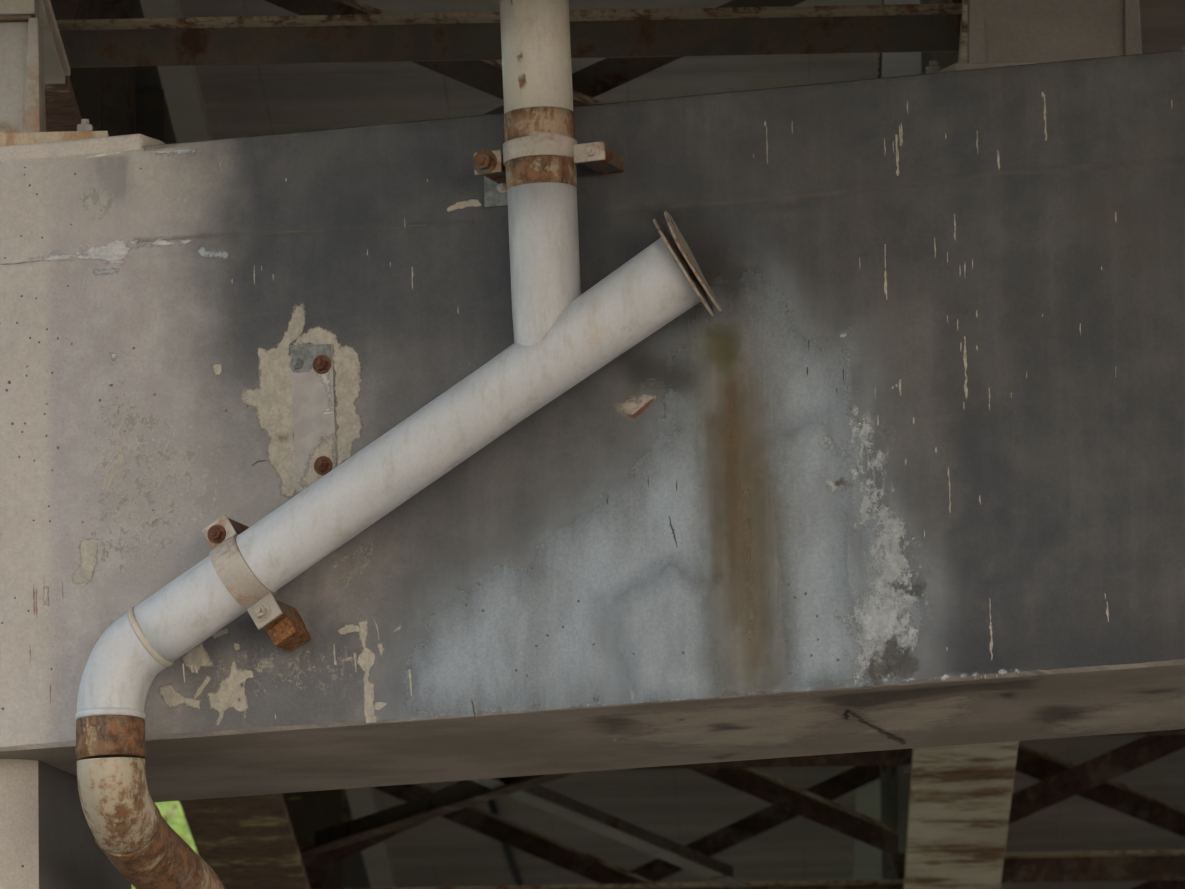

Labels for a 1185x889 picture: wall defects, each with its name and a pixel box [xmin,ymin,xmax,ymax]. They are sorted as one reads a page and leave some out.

crack [0,258,43,266]
peeling [242,304,364,498]
spalling [621,394,656,418]
water stain [402,271,927,717]
rust [710,334,771,681]
peeling [159,628,254,726]
peeling [333,619,388,723]